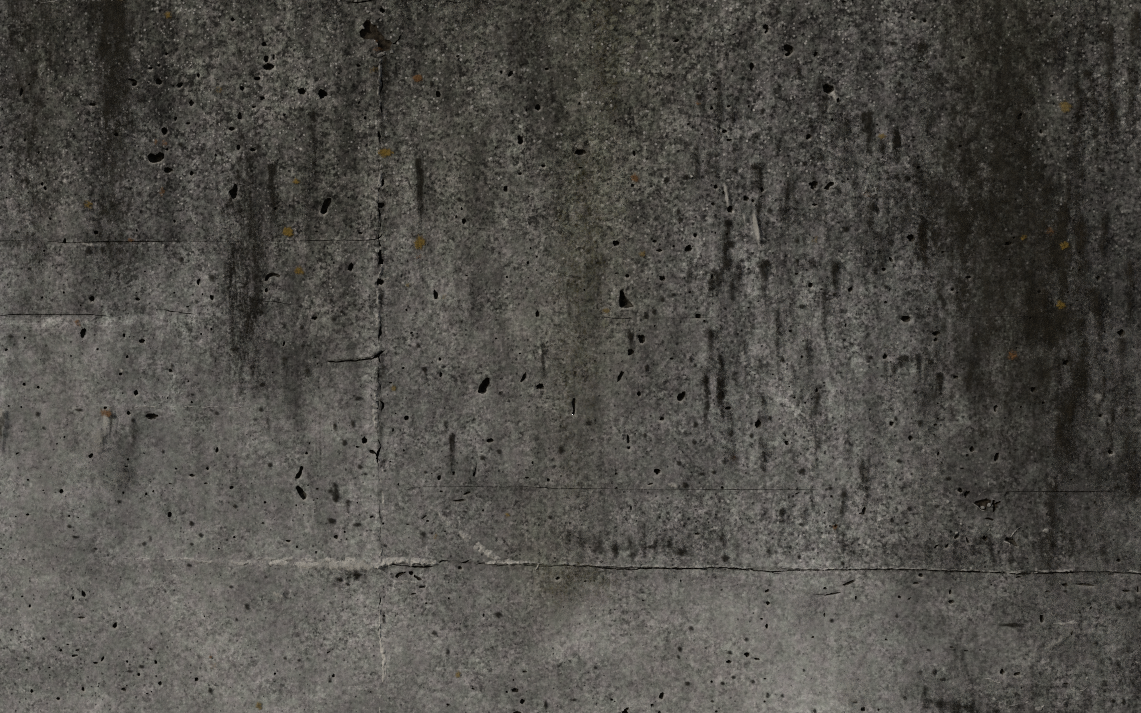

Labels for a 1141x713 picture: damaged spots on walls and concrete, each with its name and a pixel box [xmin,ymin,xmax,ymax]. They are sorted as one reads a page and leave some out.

water stain [809,84,901,160]
water stain [225,131,306,384]
water stain [687,220,793,340]
water stain [809,255,848,340]
water stain [846,0,1141,501]
water stain [702,327,766,424]